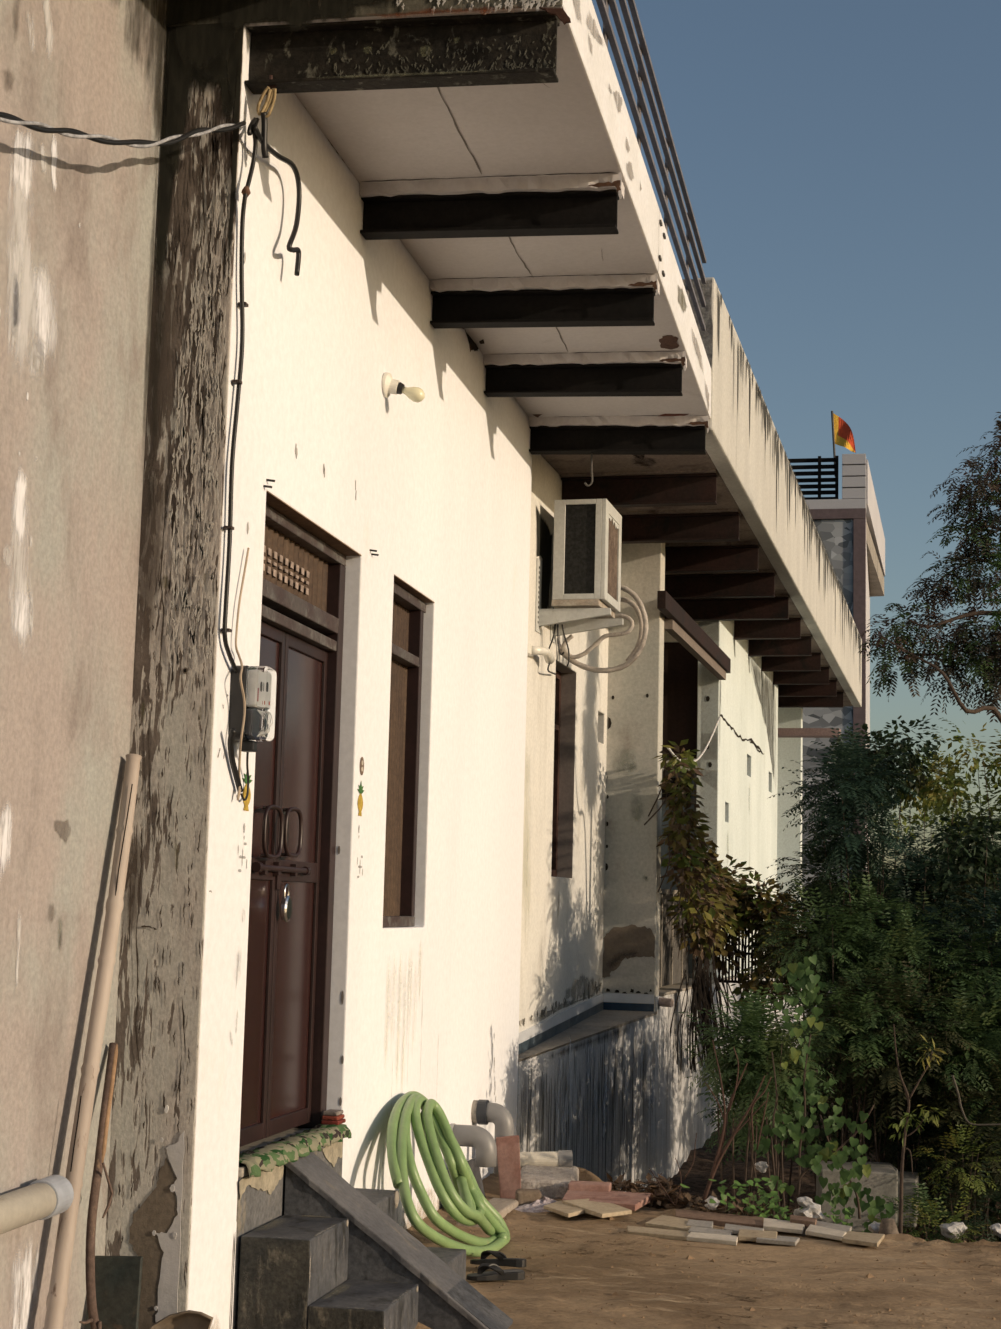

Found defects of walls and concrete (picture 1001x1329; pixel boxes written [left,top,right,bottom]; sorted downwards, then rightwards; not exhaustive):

peeling [430,0,602,53]
crack [306,87,617,182]
peeling [626,140,642,191]
water stain [130,0,388,447]
water stain [138,464,164,630]
peeling [148,746,187,855]
water stain [128,839,142,929]
flaking render [602,924,655,994]
peeling [138,901,197,1129]
water stain [520,1005,713,1182]
flaking render [118,1121,188,1329]